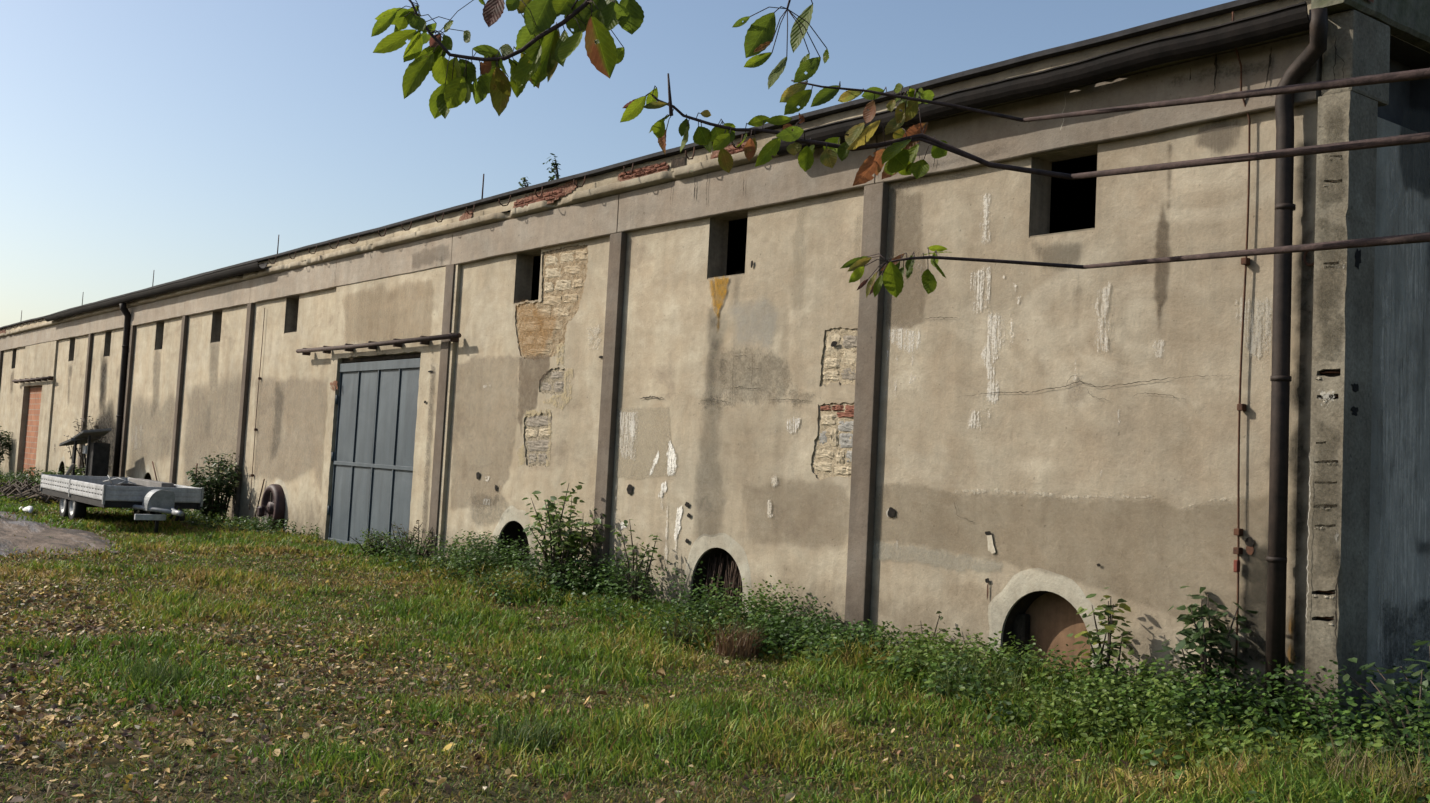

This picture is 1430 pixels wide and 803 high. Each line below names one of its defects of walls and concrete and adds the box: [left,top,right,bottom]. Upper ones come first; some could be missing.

spalling [513,180,577,208]
spalling [618,157,685,182]
spalling [710,140,748,159]
damp [1155,216,1167,311]
rust [710,277,729,328]
spalling [516,245,588,467]
spalling [821,328,858,386]
crack [967,375,1237,400]
spalling [812,402,854,480]
peeling [650,441,677,498]
peeling [674,502,691,543]